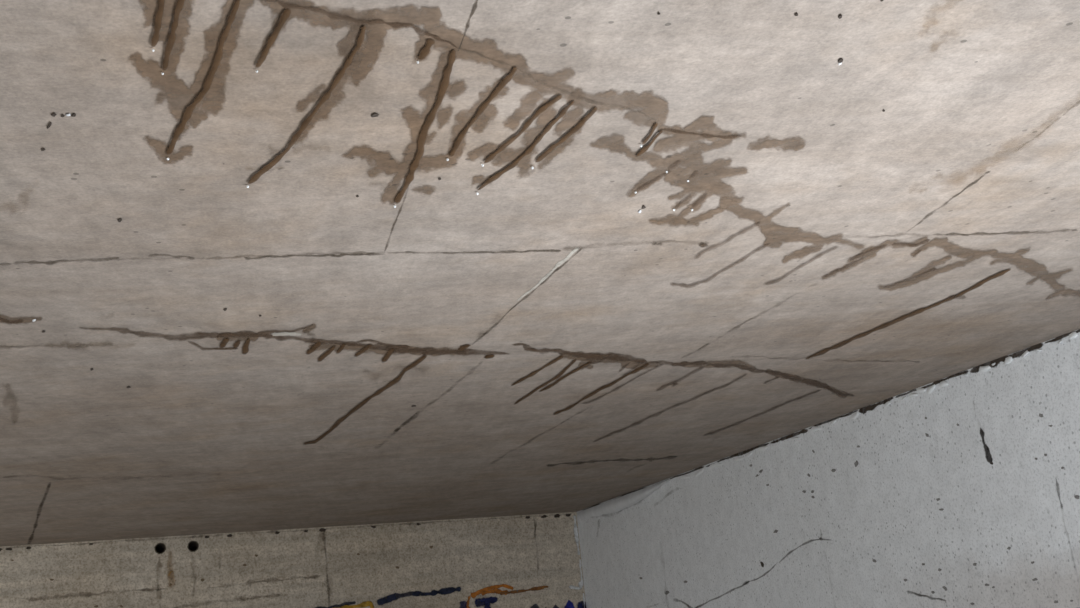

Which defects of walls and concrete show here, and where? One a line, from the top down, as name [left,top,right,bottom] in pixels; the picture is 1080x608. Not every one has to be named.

damp [0,315,42,324]
damp [130,0,1080,359]